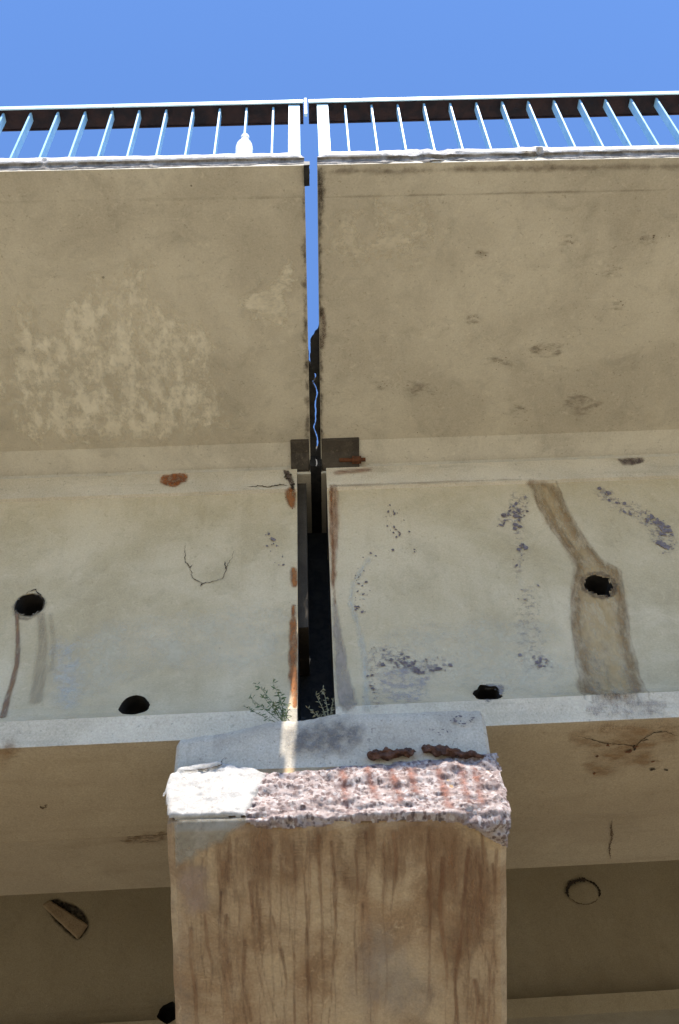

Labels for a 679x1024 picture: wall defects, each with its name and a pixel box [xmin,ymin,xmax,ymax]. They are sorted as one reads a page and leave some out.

rust [161,473,187,487]
rust [285,487,296,509]
crack [184,545,234,586]
water stain [530,483,640,698]
rust [288,605,298,707]
crack [580,731,673,751]
spalling [245,753,511,847]
crack [607,823,615,858]